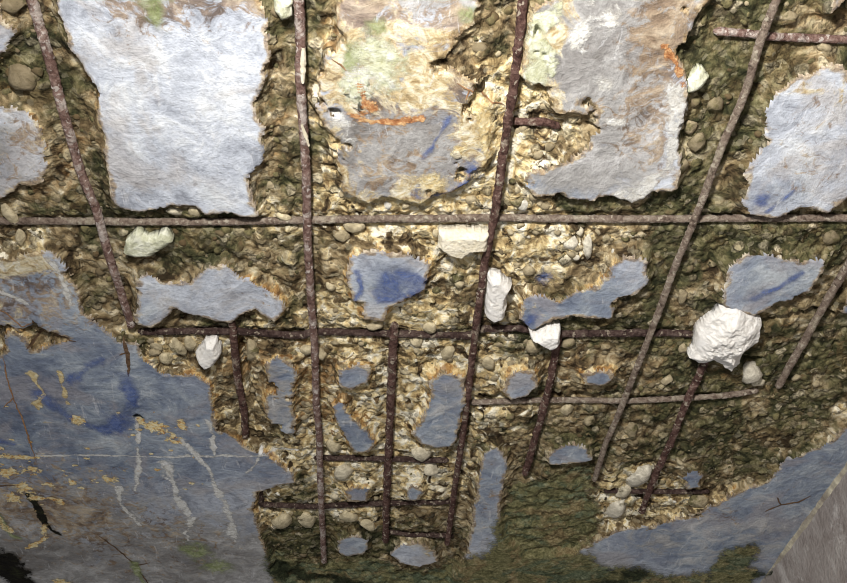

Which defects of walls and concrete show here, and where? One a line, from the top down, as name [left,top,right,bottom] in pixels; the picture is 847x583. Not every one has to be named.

rust [660,44,686,87]
rust [347,83,425,126]
spalling [0,0,319,510]
spalling [252,0,847,575]
rust [0,447,90,511]
rust [128,416,186,451]
leakage [25,358,299,541]
rust [24,525,48,549]